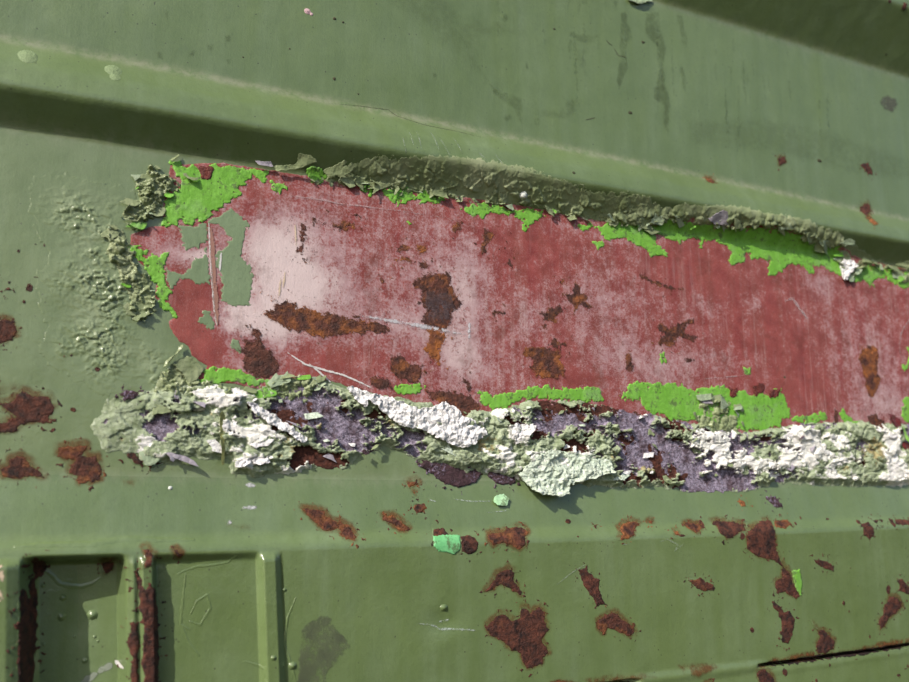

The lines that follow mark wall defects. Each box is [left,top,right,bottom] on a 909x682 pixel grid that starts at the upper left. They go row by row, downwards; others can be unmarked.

corrosion [236,288,394,388]
corrosion [357,235,483,416]
peeling [101,153,909,450]
corrosion [5,550,54,682]
corrosion [0,386,76,489]
corrosion [56,437,172,491]
corrosion [97,541,190,682]
peeling [139,451,161,466]
corrosion [300,502,366,548]
corrosion [377,460,557,677]
corrosion [575,563,641,641]
corrosion [668,490,909,682]